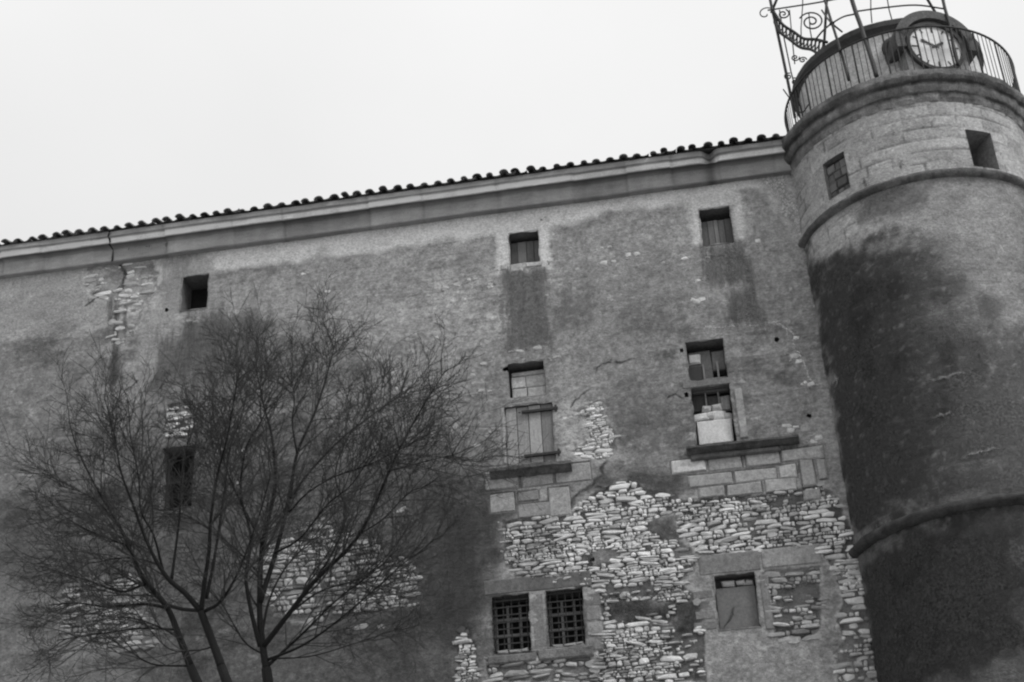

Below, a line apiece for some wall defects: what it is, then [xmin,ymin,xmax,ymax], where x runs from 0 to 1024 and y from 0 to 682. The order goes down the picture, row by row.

crack [85,231,129,306]
spalling [80,263,160,346]
damp [503,267,557,351]
spalling [165,405,195,439]
spalling [569,401,621,459]
damp [808,228,1024,682]
spalling [263,517,423,630]
spalling [452,481,877,682]